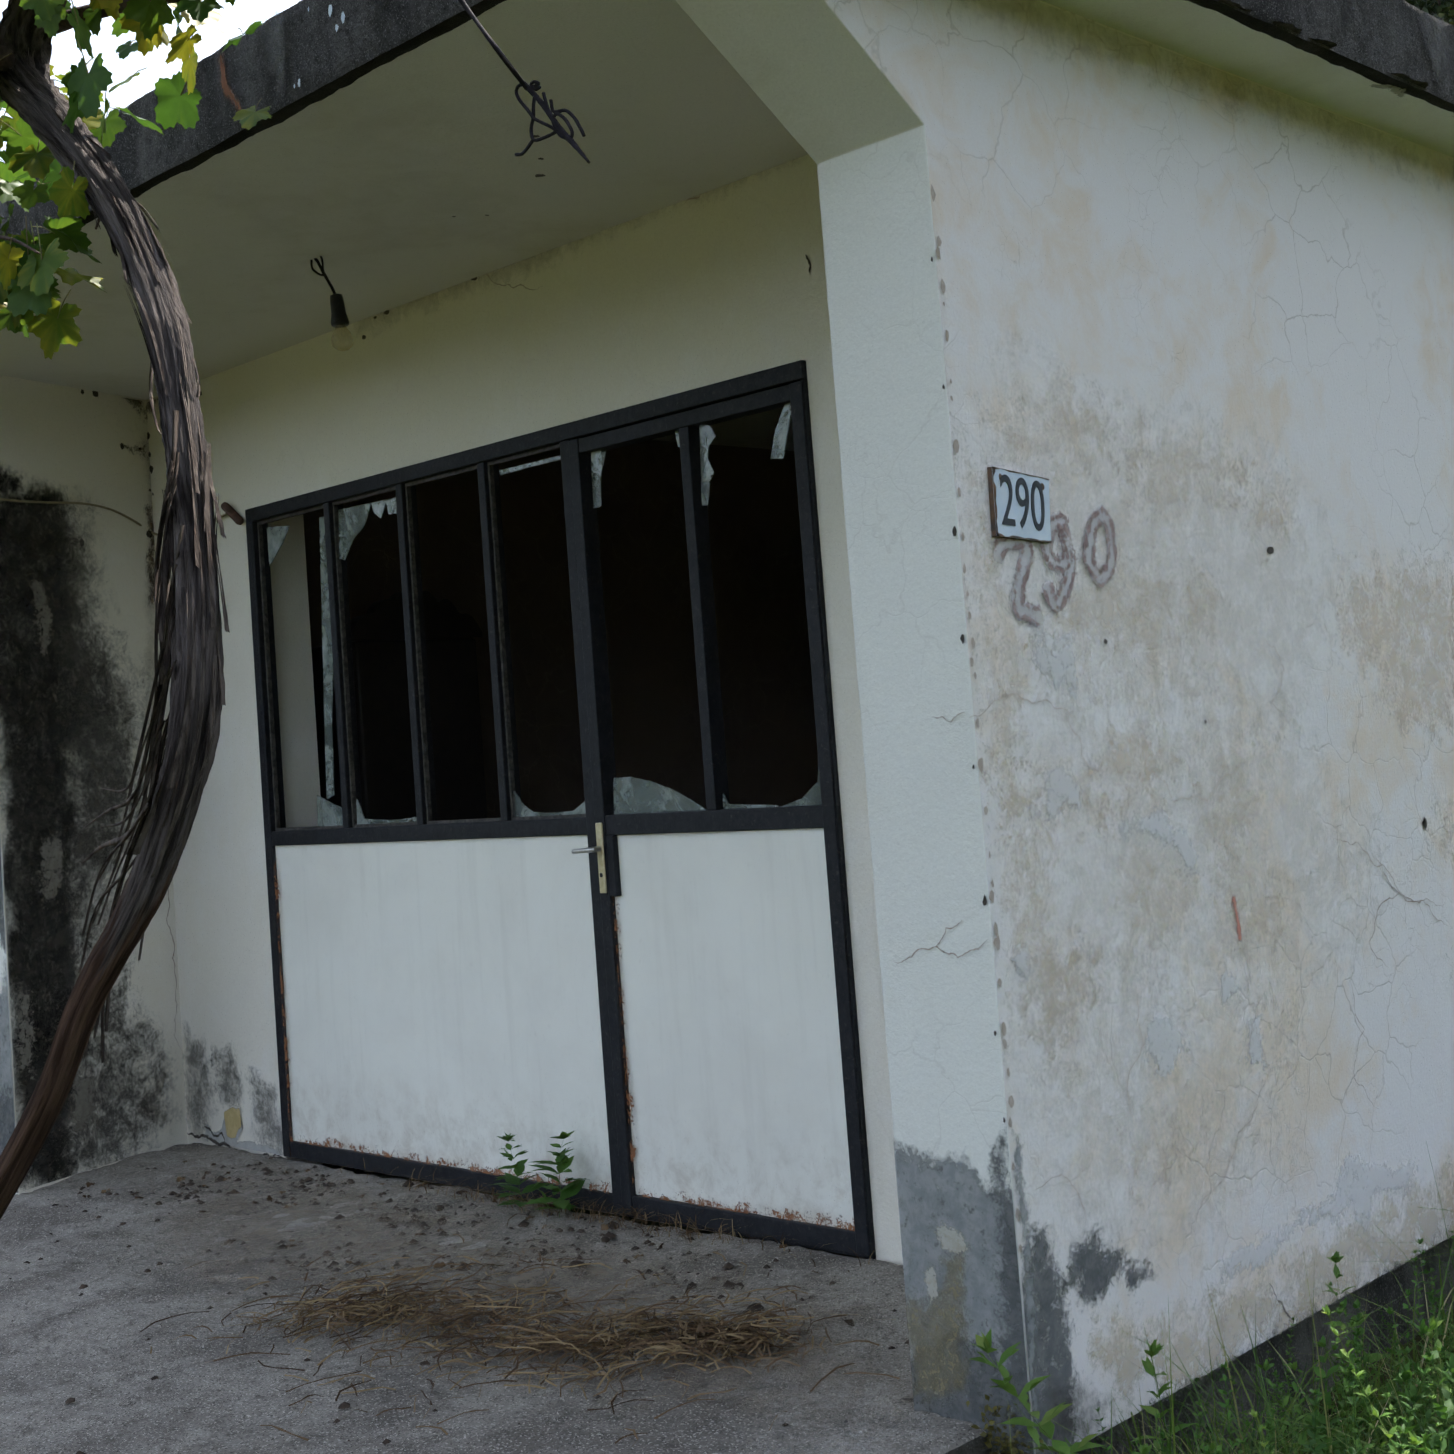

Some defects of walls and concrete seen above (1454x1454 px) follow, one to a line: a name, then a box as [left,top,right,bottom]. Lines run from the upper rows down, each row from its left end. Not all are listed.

damp [120,398,158,602]
damp [0,466,146,1155]
damp [16,977,167,1193]
damp [186,1042,283,1149]
corrosion [274,858,609,1194]
crack [895,920,987,964]
crack [1330,835,1444,968]
damp [894,1137,1154,1454]